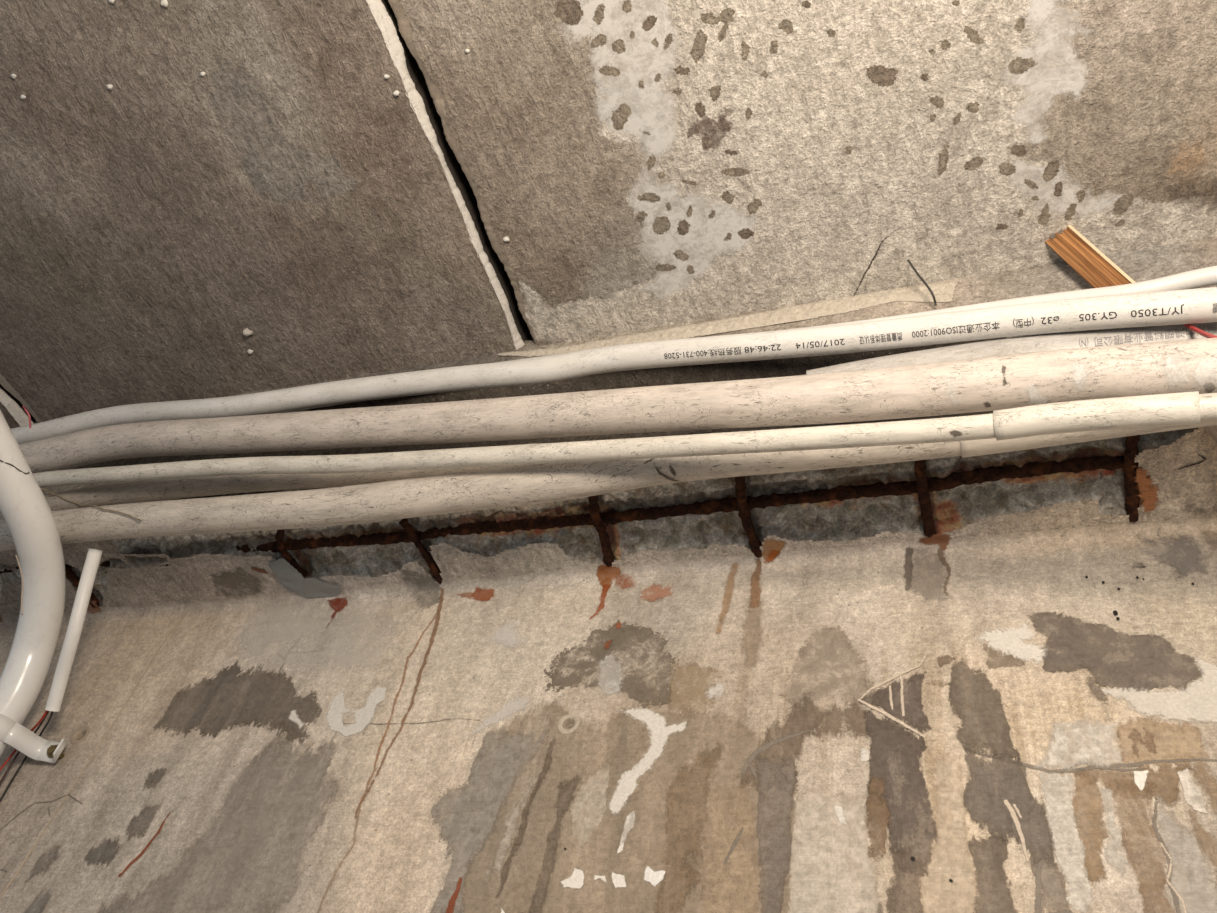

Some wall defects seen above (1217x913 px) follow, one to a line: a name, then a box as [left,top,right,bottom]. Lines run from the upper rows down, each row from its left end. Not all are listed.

spalling [64,428,1208,613]
corrosion [1133,465,1159,512]
spalling [0,559,21,617]
corrosion [589,565,671,619]
corrosion [716,563,738,633]
corrosion [744,539,785,665]
corrosion [904,533,951,600]
damp [98,661,386,913]
damp [430,612,1217,913]
damp [85,806,158,867]
crack [964,748,1217,913]